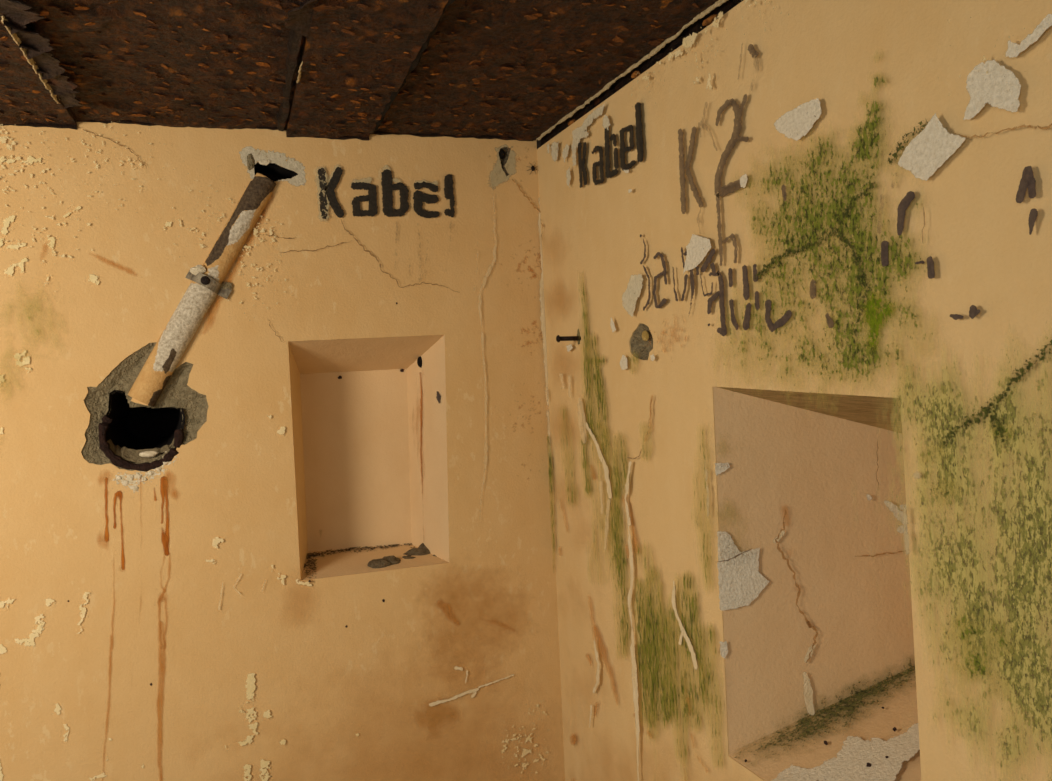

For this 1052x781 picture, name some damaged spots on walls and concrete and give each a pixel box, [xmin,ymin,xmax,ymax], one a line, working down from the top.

peeling [963,14,1052,120]
peeling [774,98,821,141]
crack [887,121,926,165]
peeling [898,113,965,181]
crack [754,183,874,323]
damp [560,374,612,550]
corrosion [104,478,125,570]
corrosion [154,476,175,555]
damp [625,461,640,781]
damp [671,581,697,669]
crack [718,510,818,715]
peeling [771,723,920,781]